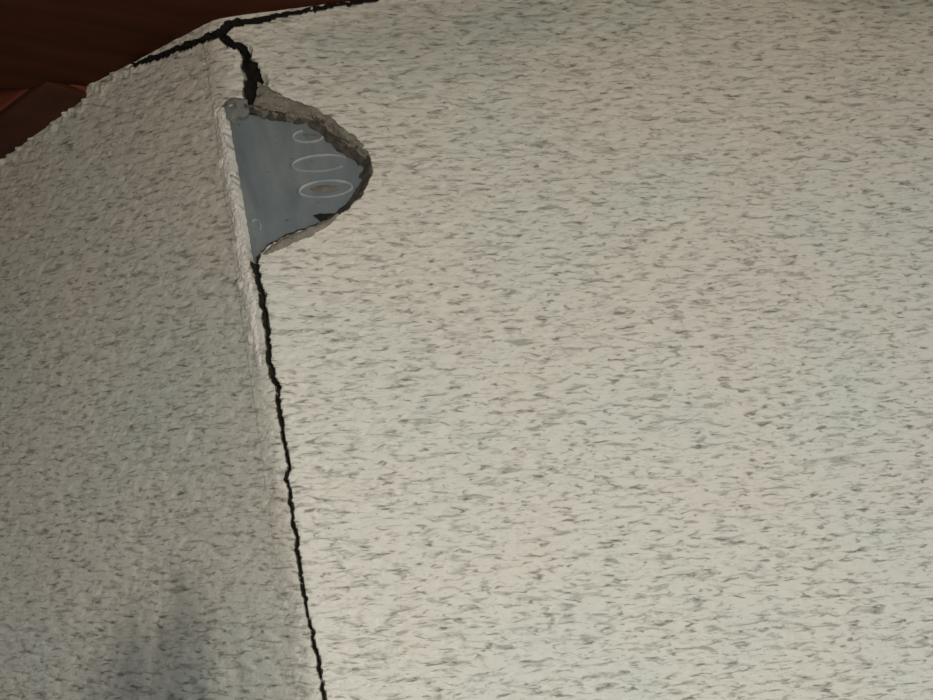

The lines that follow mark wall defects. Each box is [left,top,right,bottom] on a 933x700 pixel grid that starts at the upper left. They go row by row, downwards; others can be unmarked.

crack [131,0,378,115]
spalling [211,82,373,366]
crack [250,254,325,700]